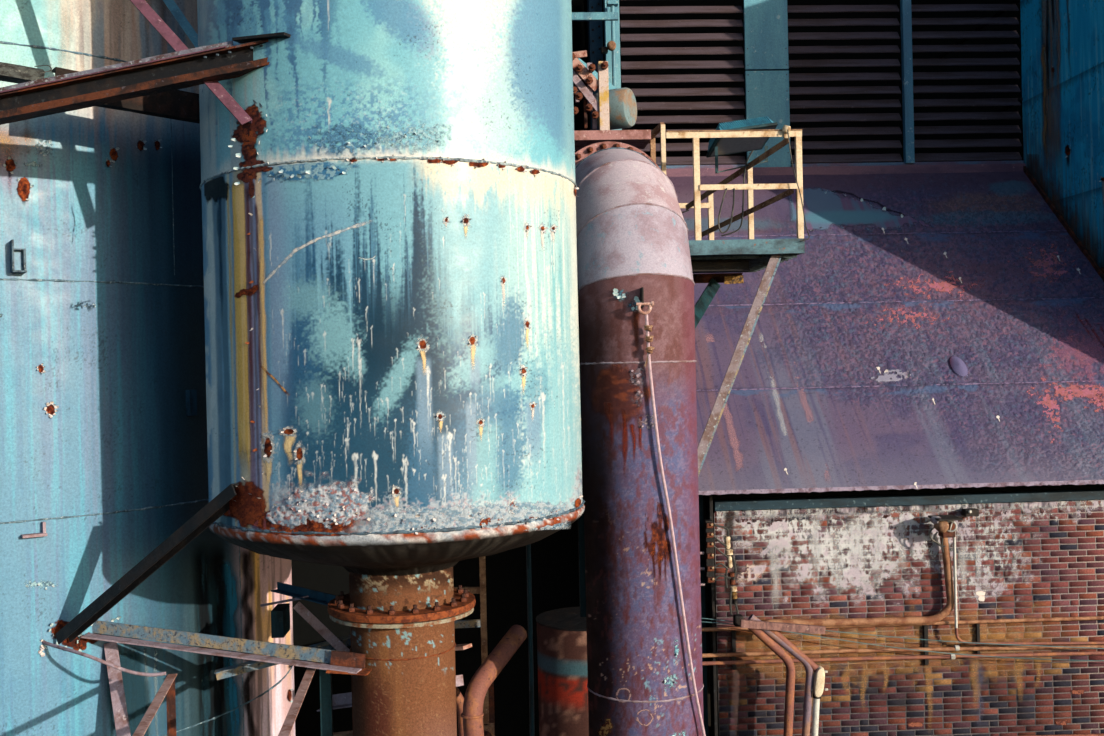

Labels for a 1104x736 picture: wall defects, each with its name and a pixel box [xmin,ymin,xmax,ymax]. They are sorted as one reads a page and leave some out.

rust [1041,0,1071,164]
rust [0,133,34,202]
rust [428,156,542,176]
rust [217,100,371,537]
rust [44,401,59,418]
rust [592,365,651,466]
rust [644,502,671,579]
water stain [717,500,1104,602]